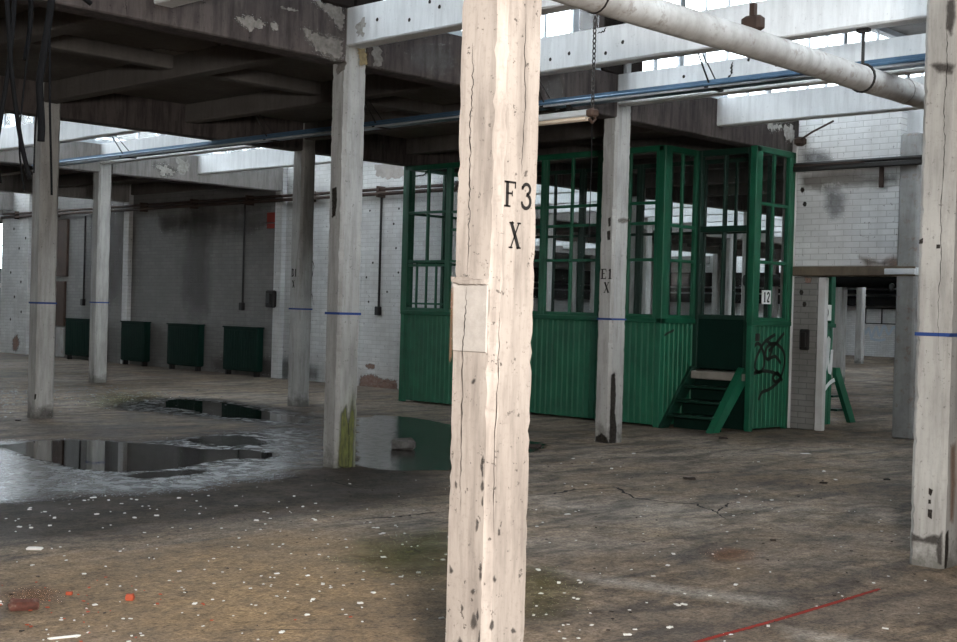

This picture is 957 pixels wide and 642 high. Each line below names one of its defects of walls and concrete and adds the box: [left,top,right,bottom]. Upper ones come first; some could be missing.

peeling [236,15,278,32]
peeling [303,0,378,74]
leakage [0,398,451,562]
crack [531,488,732,518]